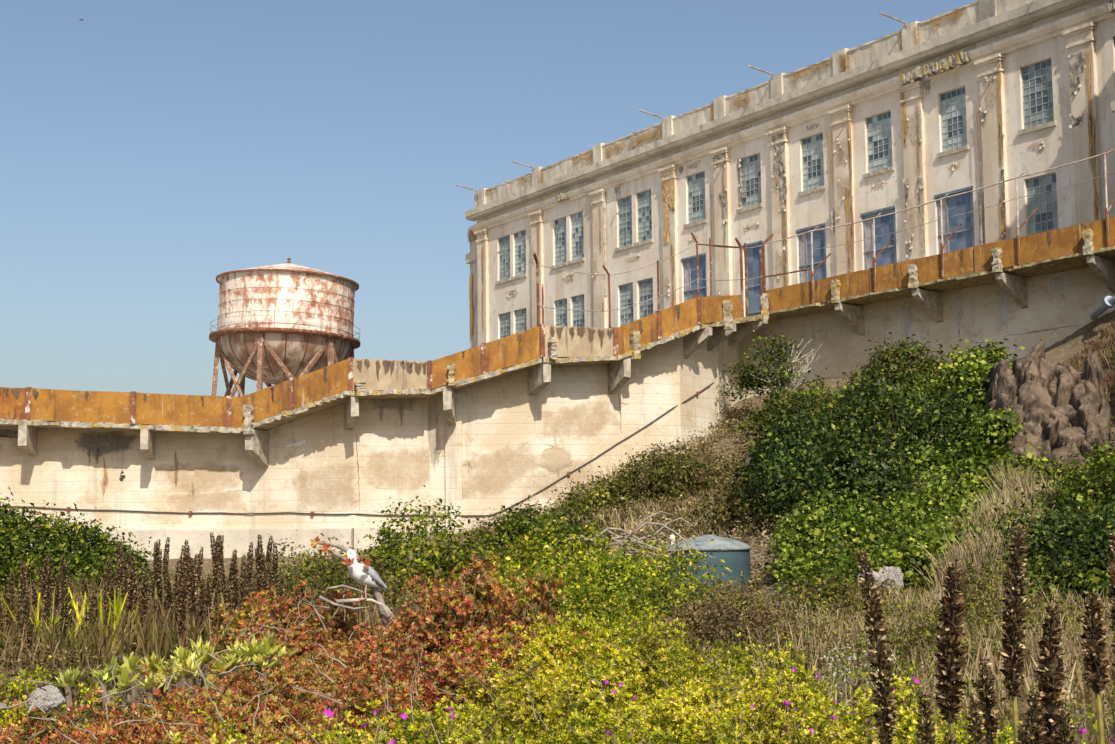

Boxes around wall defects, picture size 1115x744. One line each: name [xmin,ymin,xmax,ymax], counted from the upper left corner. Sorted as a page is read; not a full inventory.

water stain [76,432,135,463]